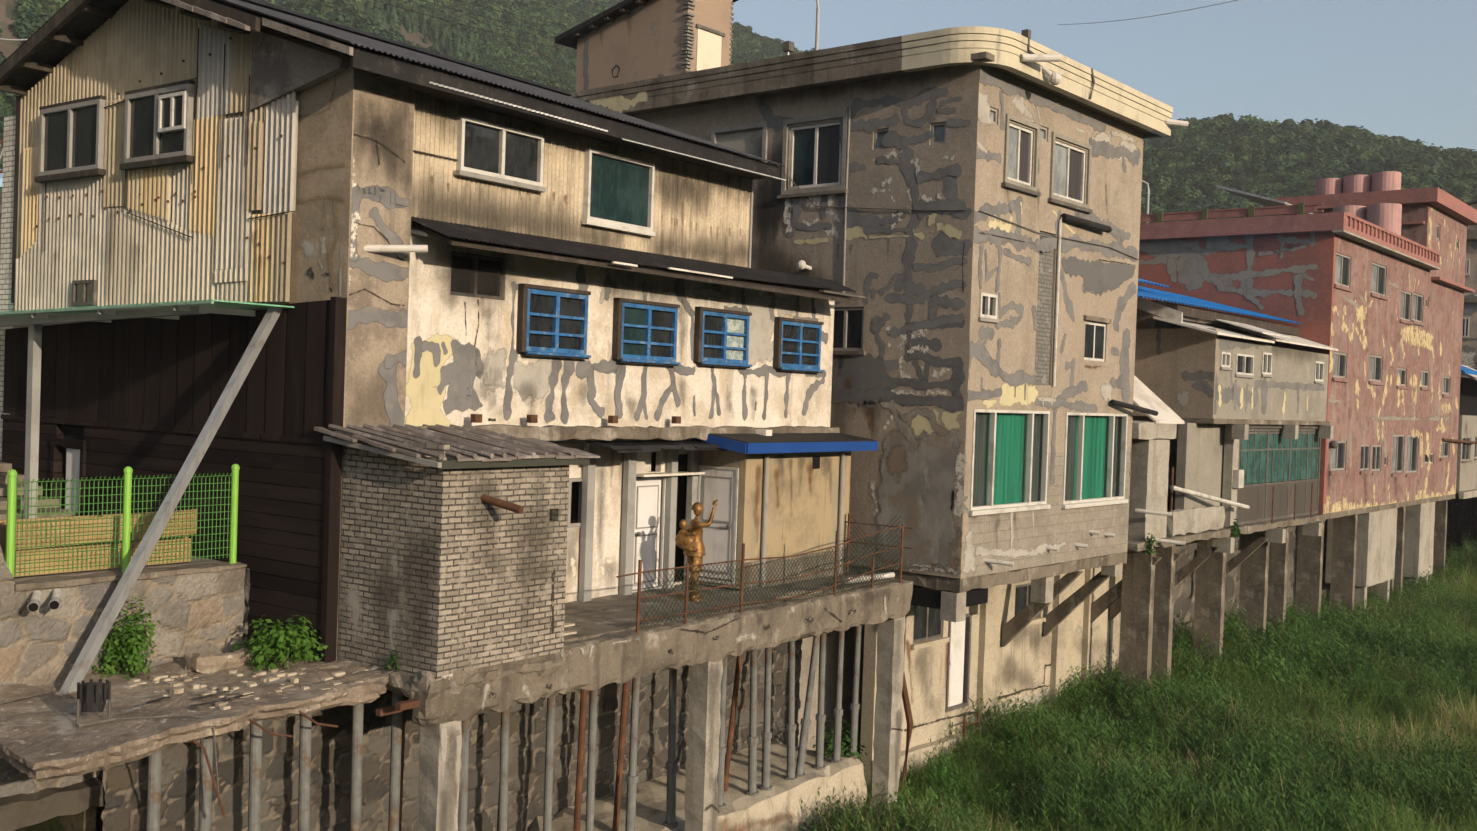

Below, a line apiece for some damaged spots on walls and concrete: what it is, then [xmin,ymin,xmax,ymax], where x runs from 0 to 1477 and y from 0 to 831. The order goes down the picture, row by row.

damp [663,175,710,205]
peeling [869,149,944,239]
peeling [307,210,361,297]
peeling [1323,276,1476,514]